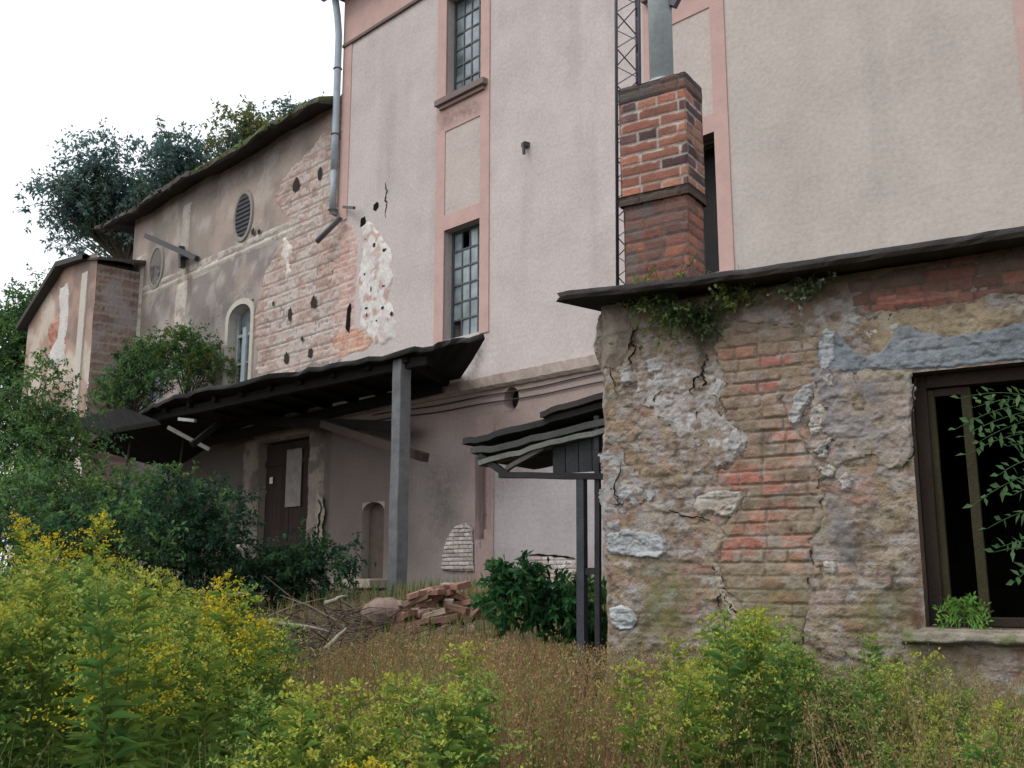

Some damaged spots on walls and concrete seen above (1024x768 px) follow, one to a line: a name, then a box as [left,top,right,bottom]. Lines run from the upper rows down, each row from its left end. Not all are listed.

spalling [254,94,396,377]
peeling [48,283,69,368]
crack [610,324,638,395]
crack [689,354,709,393]
spalling [848,246,1024,353]
spalling [441,523,474,571]
crack [613,462,624,506]
peeling [598,448,667,559]
crack [669,510,710,521]
spalling [619,319,916,649]
crack [712,563,740,624]